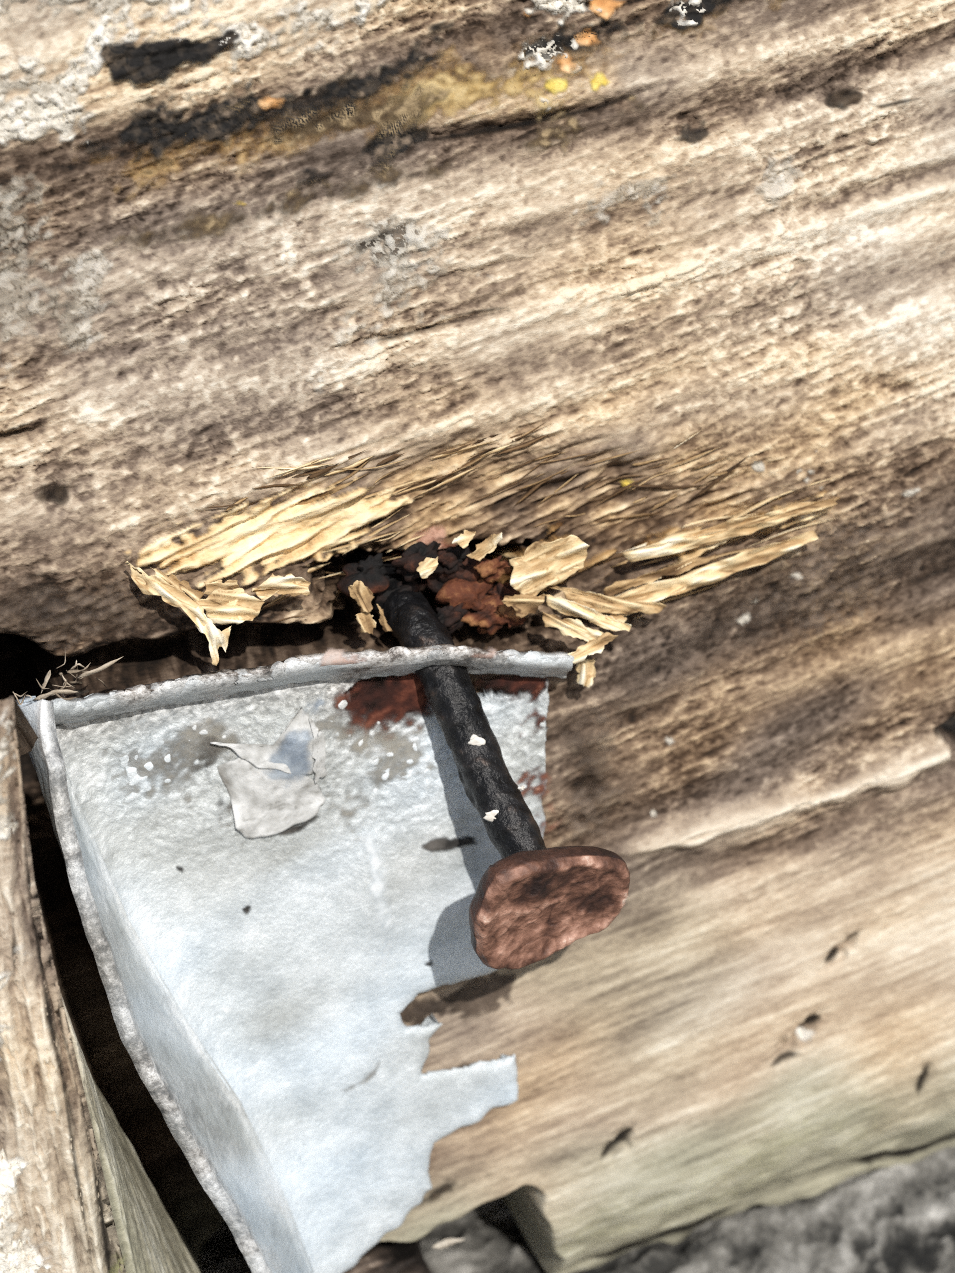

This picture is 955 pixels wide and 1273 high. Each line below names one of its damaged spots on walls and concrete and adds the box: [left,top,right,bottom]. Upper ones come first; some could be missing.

peeling [125,561,311,666]
peeling [348,580,393,635]
rust [385,549,437,597]
peeling [416,557,438,579]
rust [417,526,456,552]
peeling [452,530,503,561]
peeling [501,498,837,688]
rust [321,650,357,667]
rust [335,673,433,730]
rust [473,651,548,727]
rust [519,772,548,796]